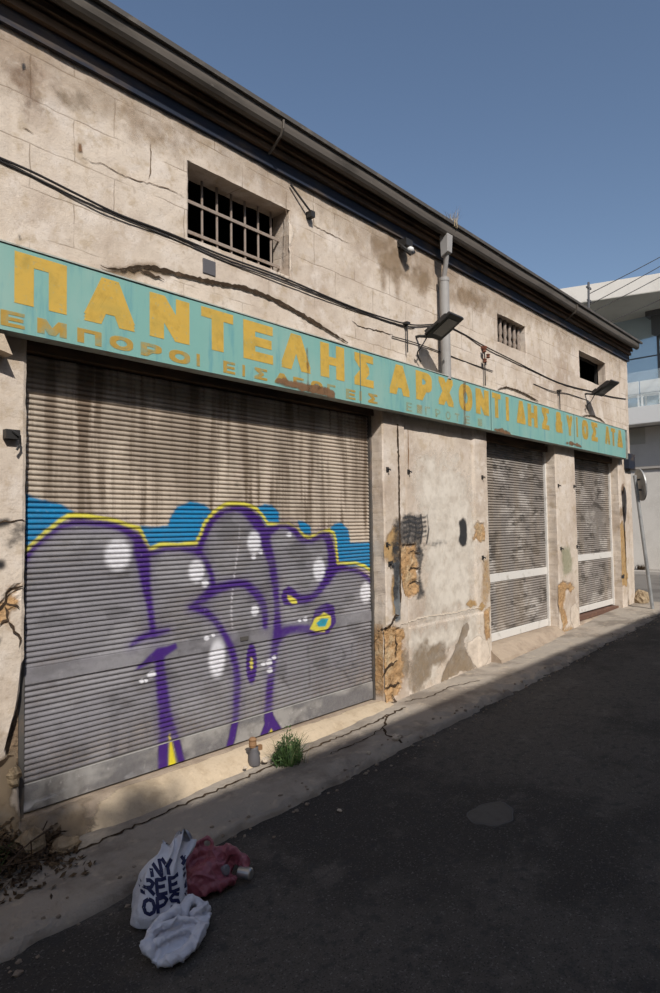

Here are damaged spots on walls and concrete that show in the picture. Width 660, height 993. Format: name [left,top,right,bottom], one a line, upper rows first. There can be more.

crack [101,265,390,343]
flaking render [620,508,628,586]
flaking render [90,453,490,832]
damp [402,623,475,691]
flaking render [558,582,579,632]